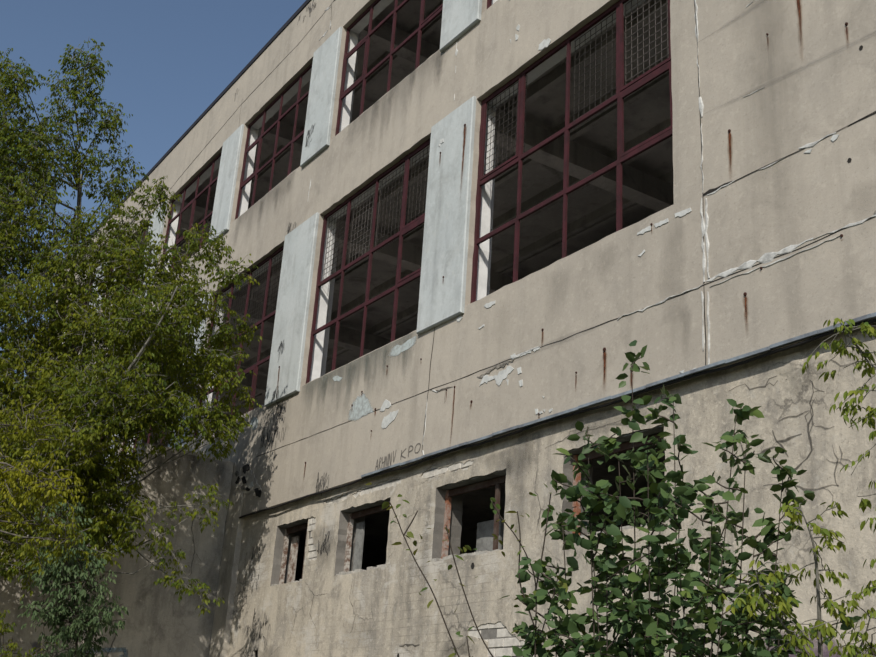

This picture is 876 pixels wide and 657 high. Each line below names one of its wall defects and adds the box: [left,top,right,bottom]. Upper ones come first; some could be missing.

peeling [637,208,692,235]
peeling [390,336,416,356]
peeling [477,347,540,387]
crack [729,376,787,391]
peeling [349,394,399,429]
crack [741,380,858,502]